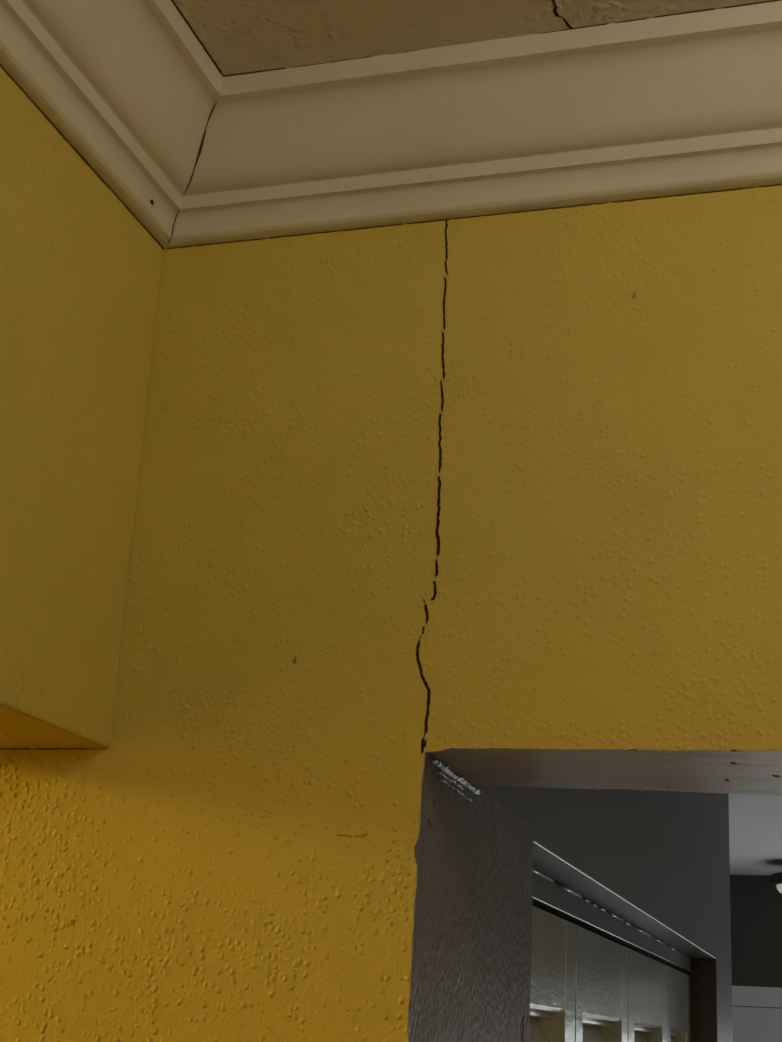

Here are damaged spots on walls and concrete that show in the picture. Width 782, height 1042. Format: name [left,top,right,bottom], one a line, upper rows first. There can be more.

crack [549,0,573,30]
crack [167,102,217,245]
crack [416,220,450,749]